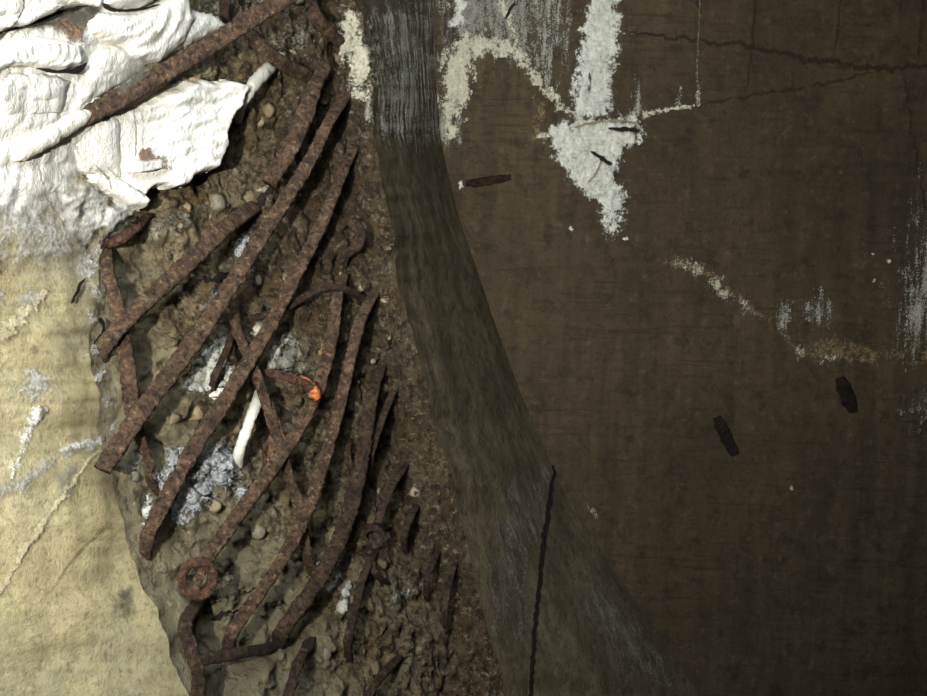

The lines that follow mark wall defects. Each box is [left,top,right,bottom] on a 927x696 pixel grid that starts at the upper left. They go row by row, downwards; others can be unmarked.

corrosion [138,147,168,170]
leakage [337,0,647,240]
crack [614,79,701,122]
crack [624,30,927,73]
spalling [88,0,505,696]
leakage [896,196,927,372]